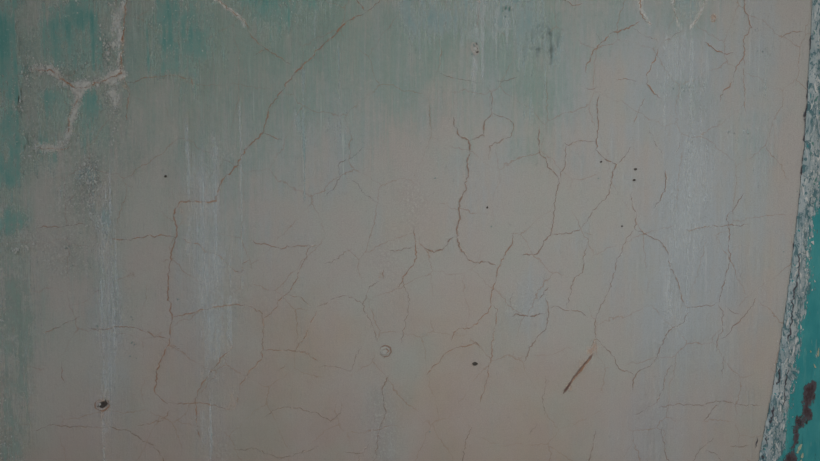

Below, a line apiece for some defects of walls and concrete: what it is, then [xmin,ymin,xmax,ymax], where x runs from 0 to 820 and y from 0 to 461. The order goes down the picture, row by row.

crack [29,0,193,156]
crack [109,0,384,435]
crack [396,93,789,459]
crack [707,0,752,107]
peeling [758,0,820,461]
crack [781,243,800,342]